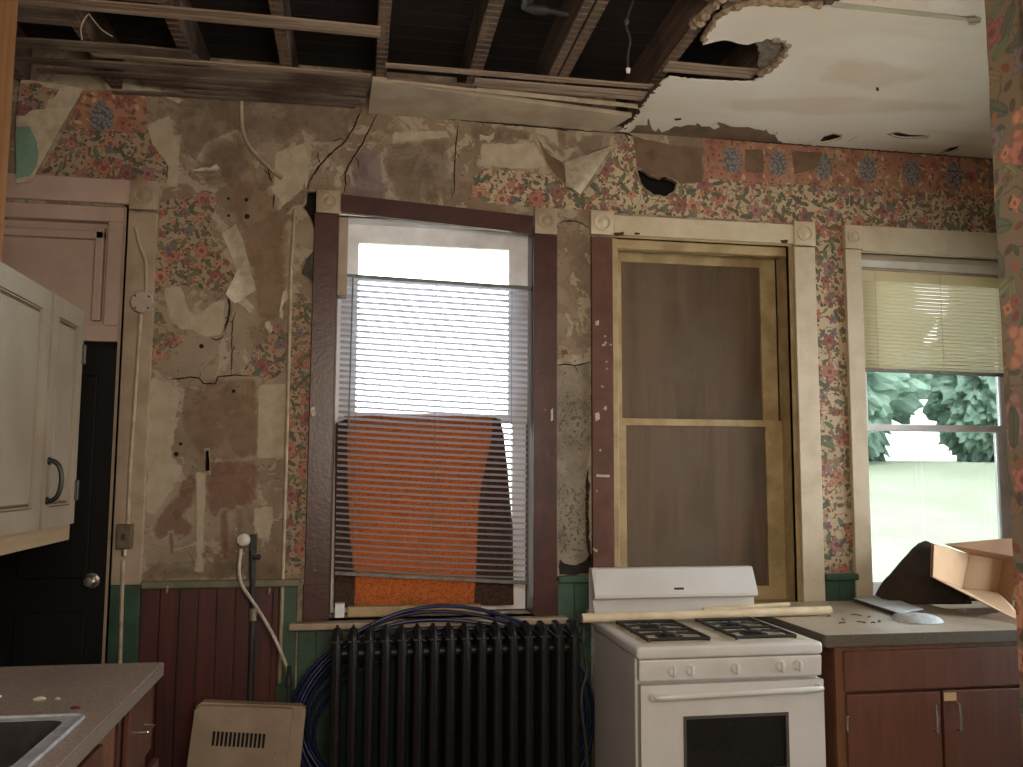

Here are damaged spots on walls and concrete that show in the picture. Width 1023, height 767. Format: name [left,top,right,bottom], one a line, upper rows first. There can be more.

flaking render [688,0,840,43]
flaking render [755,38,792,78]
peeling [621,80,783,143]
crack [307,108,378,194]
flaking render [301,165,318,229]
flaking render [636,167,679,198]
flaking render [299,252,313,285]
peeling [265,290,288,335]
crack [170,293,253,385]